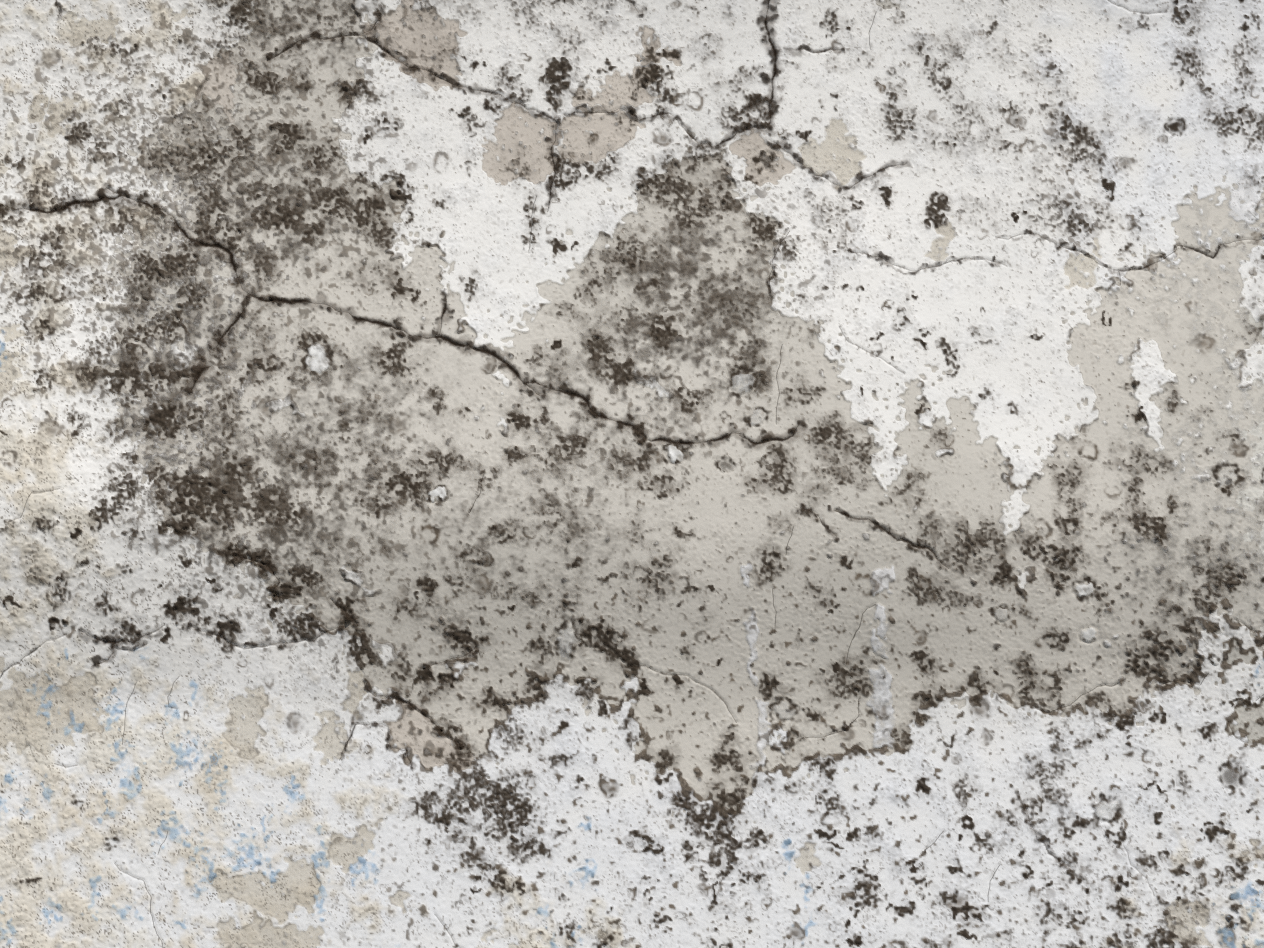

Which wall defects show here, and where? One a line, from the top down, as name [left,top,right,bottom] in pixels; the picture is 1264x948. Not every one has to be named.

peeling [58,13,118,46]
damp [451,36,616,137]
crack [266,0,894,204]
damp [65,103,413,636]
crack [0,184,806,450]
peeling [94,0,1264,812]
damp [635,130,812,256]
crack [848,229,1239,274]
damp [907,459,1082,606]
damp [412,719,572,896]
damp [644,610,801,945]
damp [839,860,989,947]